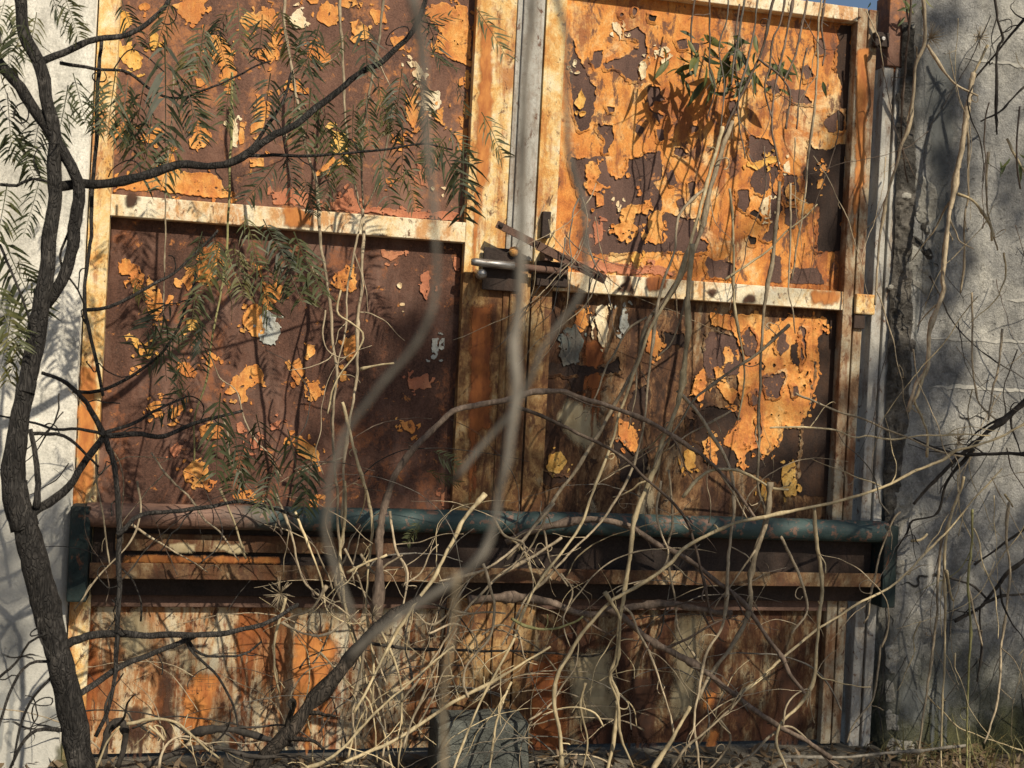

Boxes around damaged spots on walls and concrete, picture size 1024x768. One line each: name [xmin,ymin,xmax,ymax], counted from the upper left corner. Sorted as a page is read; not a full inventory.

peeling [113,122,237,203]
peeling [173,0,474,152]
rust [473,24,493,277]
peeling [567,5,739,281]
peeling [734,23,853,285]
peeling [118,243,224,335]
rust [73,366,96,503]
peeling [678,308,838,502]
rust [127,659,221,759]
rust [291,626,338,714]
rust [531,653,614,750]
rust [775,664,801,745]